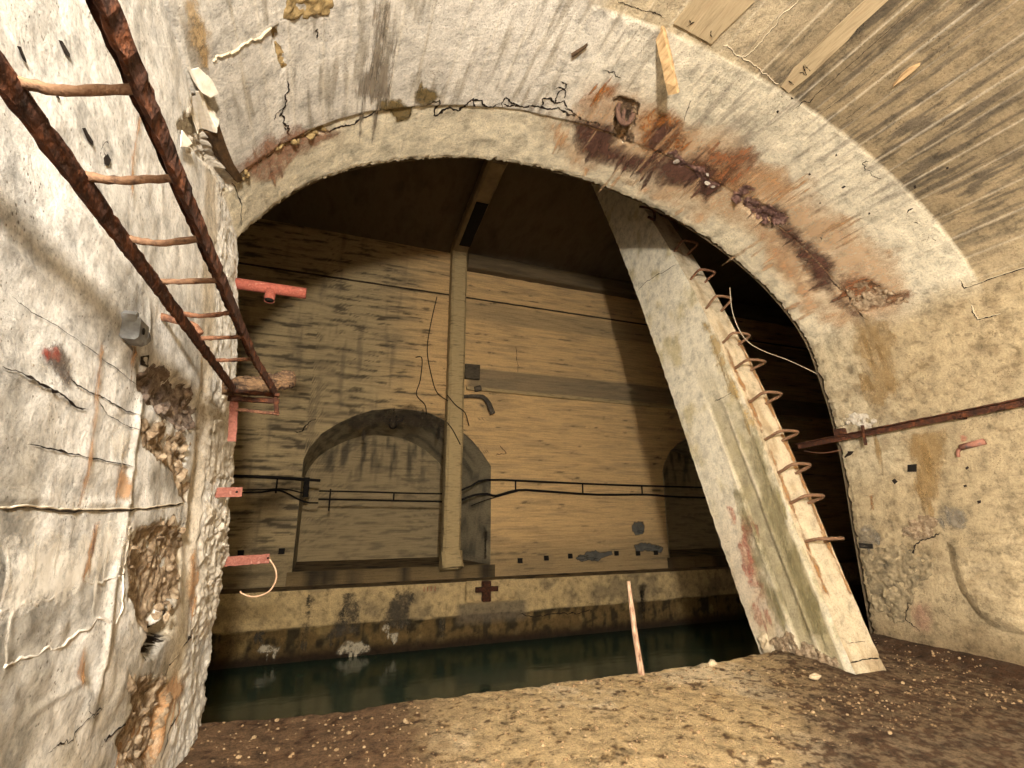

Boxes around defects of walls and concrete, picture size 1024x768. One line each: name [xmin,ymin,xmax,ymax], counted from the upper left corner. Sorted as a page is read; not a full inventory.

spalling [271,0,334,68]
crack [274,81,290,135]
crack [317,82,600,135]
corrosion [554,78,909,319]
crack [4,367,140,430]
crack [30,444,131,466]
spalling [136,363,236,502]
damp [910,433,966,529]
spalling [861,515,938,624]
spalling [115,514,186,768]
damp [327,593,369,657]
damp [382,591,414,644]